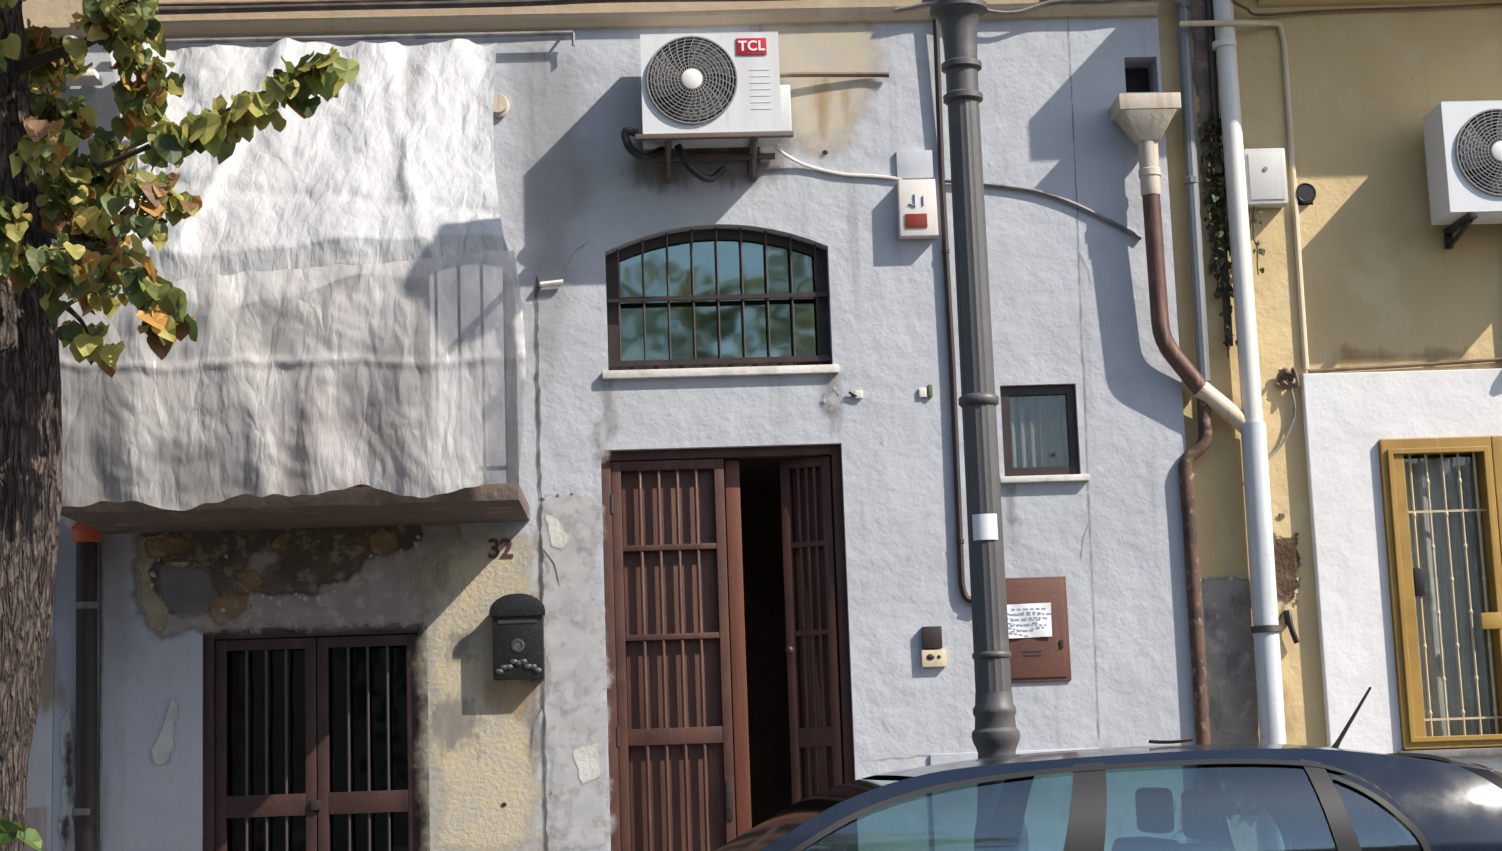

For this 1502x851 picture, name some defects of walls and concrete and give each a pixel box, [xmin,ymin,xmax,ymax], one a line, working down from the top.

water stain [759,23,879,154]
flaking render [132,523,466,640]
flaking render [1273,533,1302,605]
peeling [535,489,613,851]